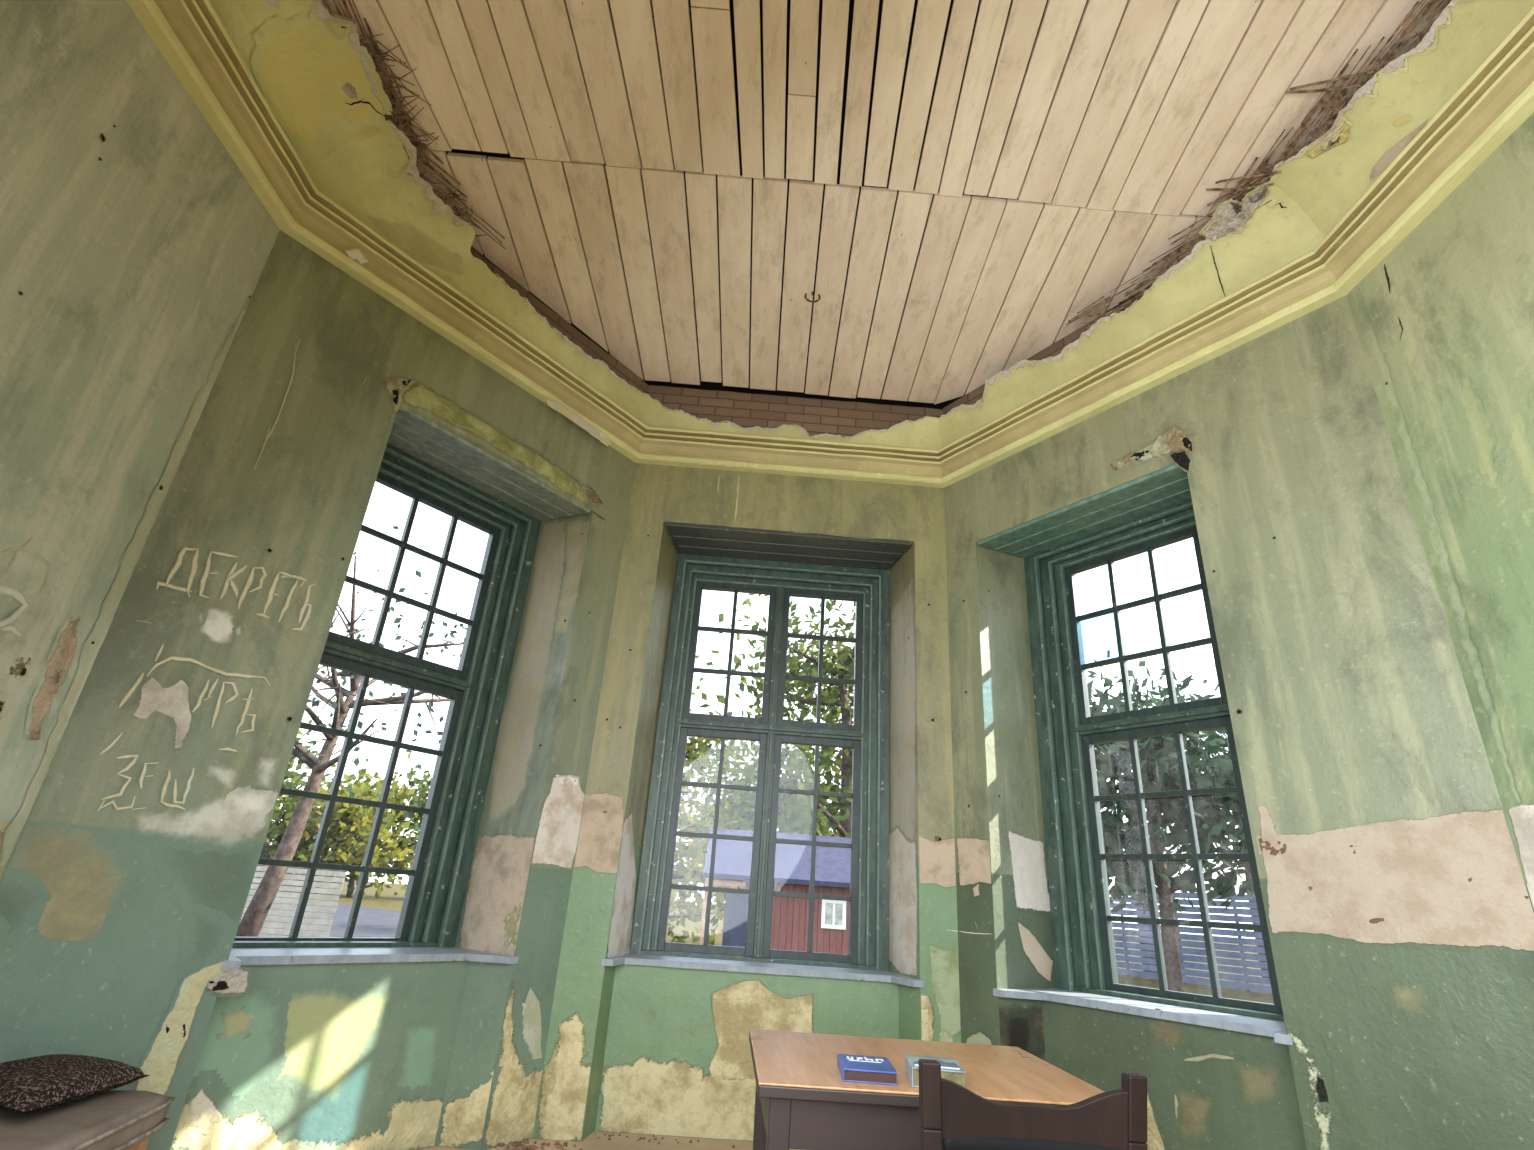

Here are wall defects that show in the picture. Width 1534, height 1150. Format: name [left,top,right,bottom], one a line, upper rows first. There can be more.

flaking render [307,0,1476,446]
flaking render [1109,423,1195,473]
flaking render [0,615,94,741]
flaking render [132,774,815,1150]
flaking render [889,825,1054,1045]
peeling [1255,800,1534,956]
flaking render [1146,1089,1167,1150]
flaking render [1283,1016,1352,1150]